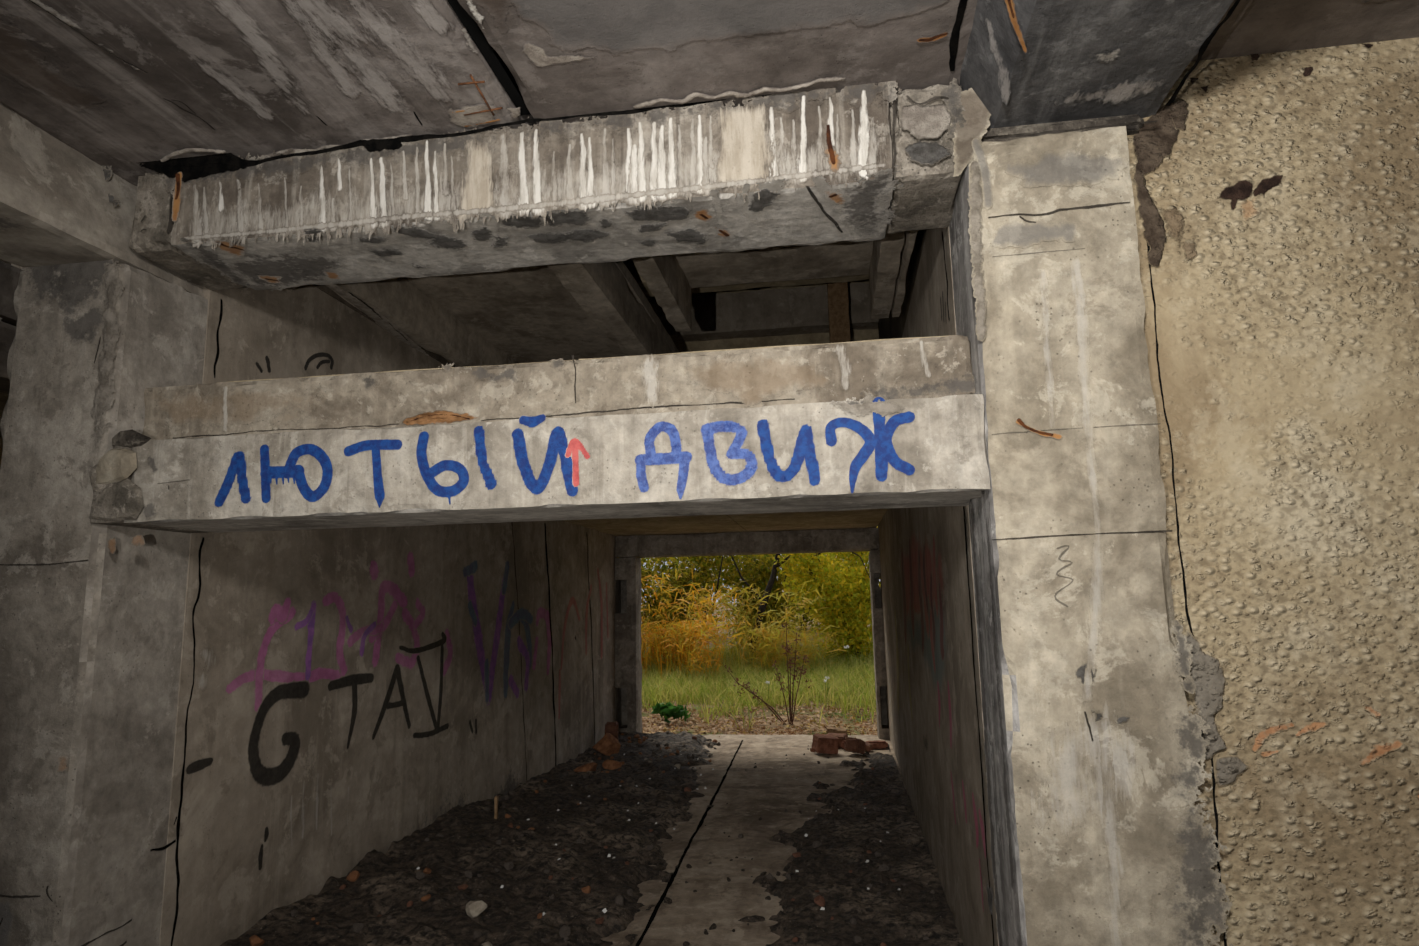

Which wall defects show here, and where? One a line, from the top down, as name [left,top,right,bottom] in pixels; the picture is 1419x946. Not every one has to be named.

corrosion [1004,0,1027,54]
crack [140,0,968,234]
corrosion [172,172,183,222]
water stain [180,90,904,291]
corrosion [824,125,842,173]
crack [988,179,1146,223]
peeling [1132,77,1209,267]
flaking render [1219,175,1283,222]
spalling [402,410,479,426]
corrosion [1015,418,1063,440]
crack [963,243,1195,946]
crack [150,537,204,946]